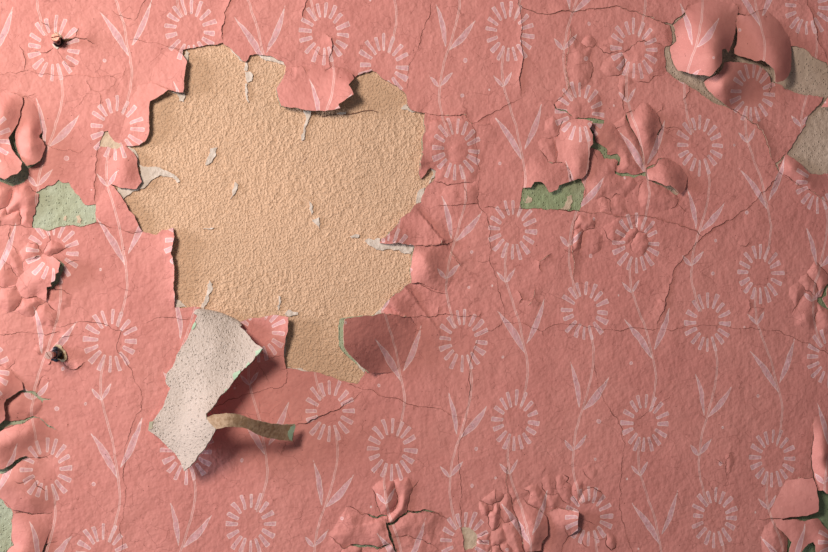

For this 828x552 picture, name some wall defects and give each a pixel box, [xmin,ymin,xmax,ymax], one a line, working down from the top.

crack [520,5,667,102]
peeling [664,1,828,190]
flaking render [0,43,460,384]
crack [413,82,828,550]
peeling [0,361,66,552]
peeling [757,416,828,552]